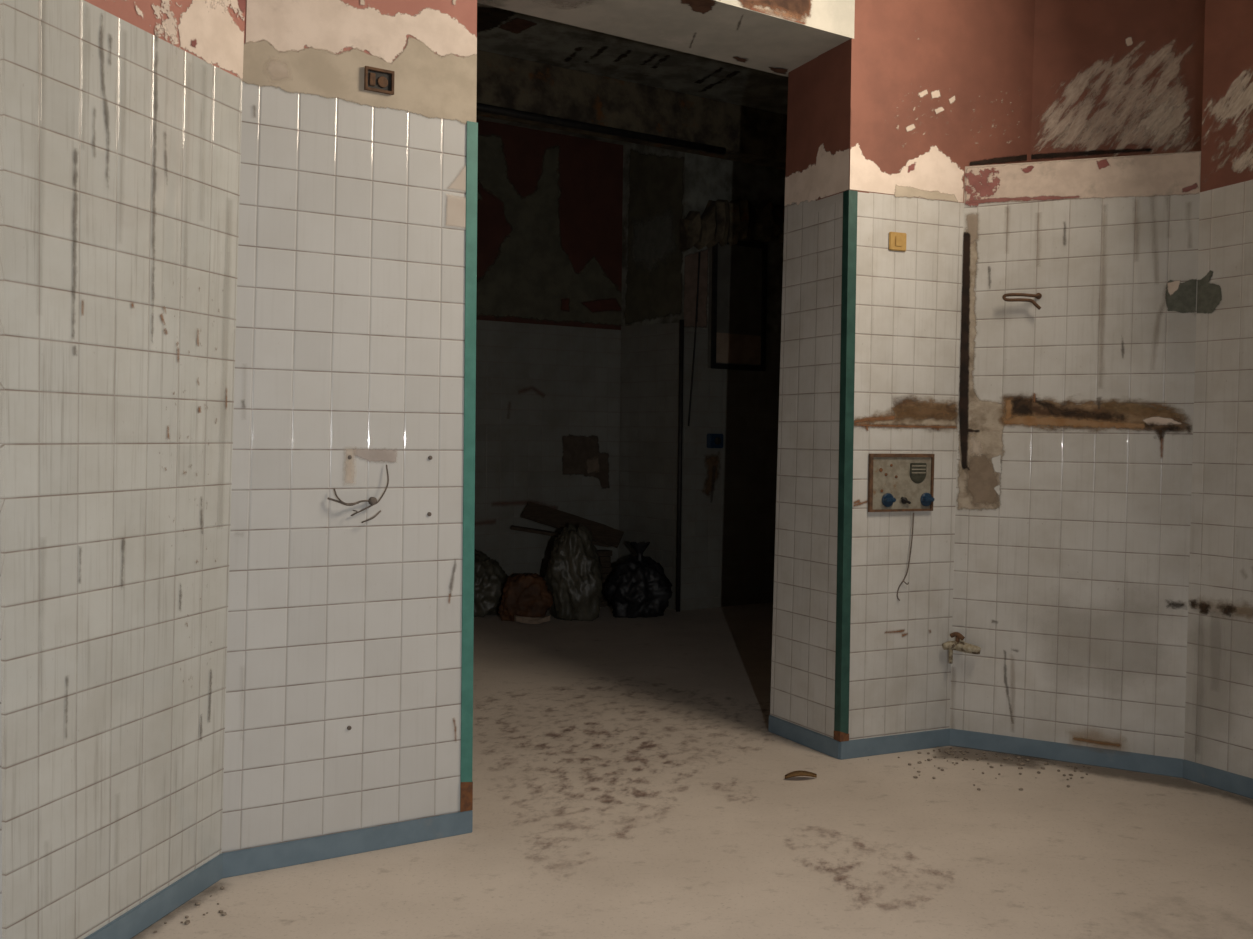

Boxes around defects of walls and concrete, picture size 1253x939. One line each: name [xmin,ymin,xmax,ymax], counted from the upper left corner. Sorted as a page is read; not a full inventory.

flaking render [681,0,715,14]
flaking render [739,0,812,21]
peeling [134,0,622,326]
peeling [784,37,1253,510]
corrosion [1168,601,1253,616]